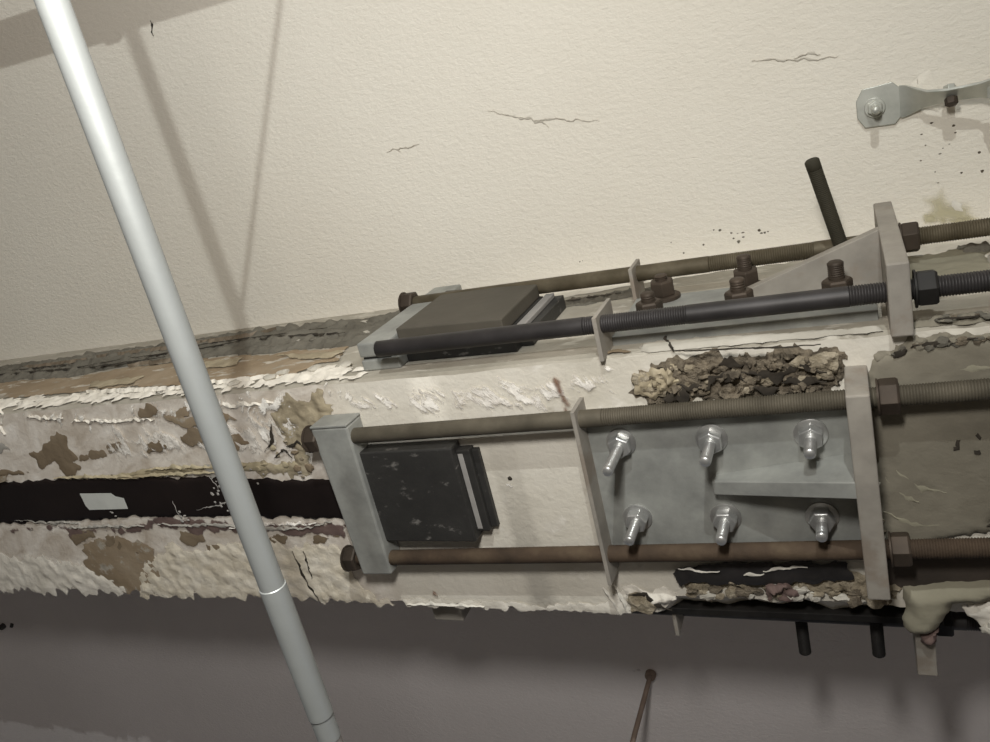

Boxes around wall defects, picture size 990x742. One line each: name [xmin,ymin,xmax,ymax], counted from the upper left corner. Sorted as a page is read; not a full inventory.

crack [753,52,831,62]
crack [492,110,599,124]
leakage [925,199,971,222]
spalling [0,342,181,399]
spalling [196,310,400,386]
spalling [629,343,848,405]
peeling [0,469,29,483]
peeling [79,442,122,461]
peeling [255,388,333,479]
peeling [139,541,261,601]
peeling [270,537,394,607]
spalling [624,560,902,615]